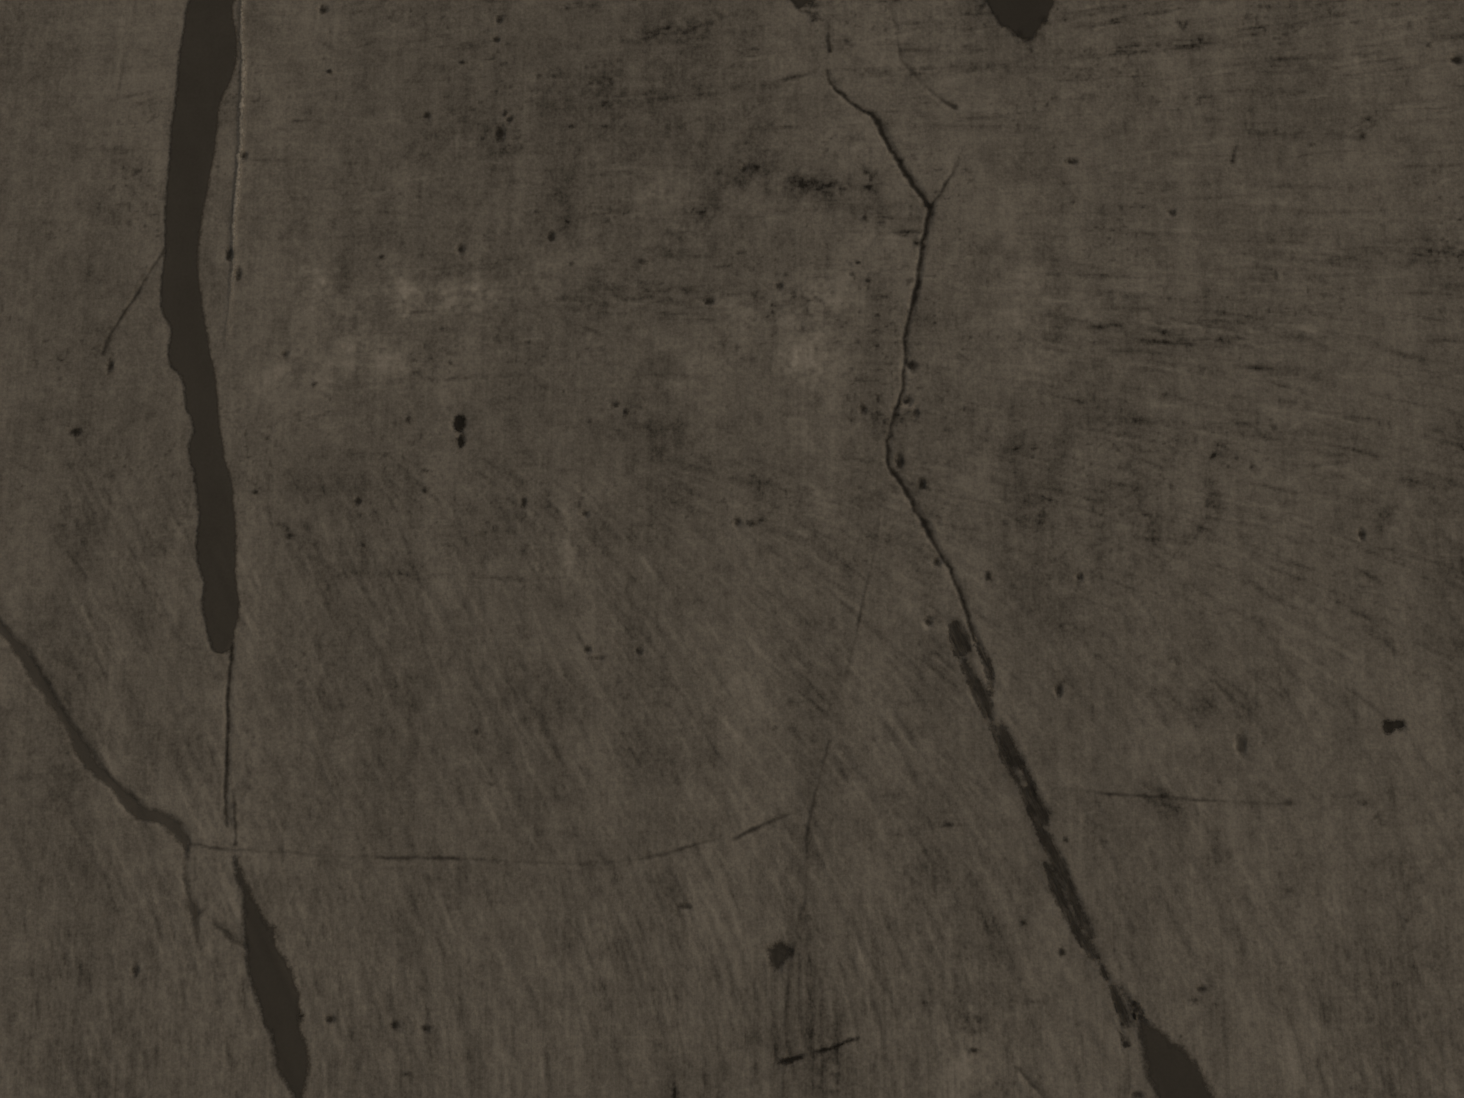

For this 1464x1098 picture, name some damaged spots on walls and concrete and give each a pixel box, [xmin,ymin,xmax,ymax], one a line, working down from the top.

damp [981,0,1054,40]
damp [161,0,240,654]
crack [828,36,979,644]
crack [0,621,245,946]
damp [234,858,311,1098]
damp [1139,1017,1214,1098]